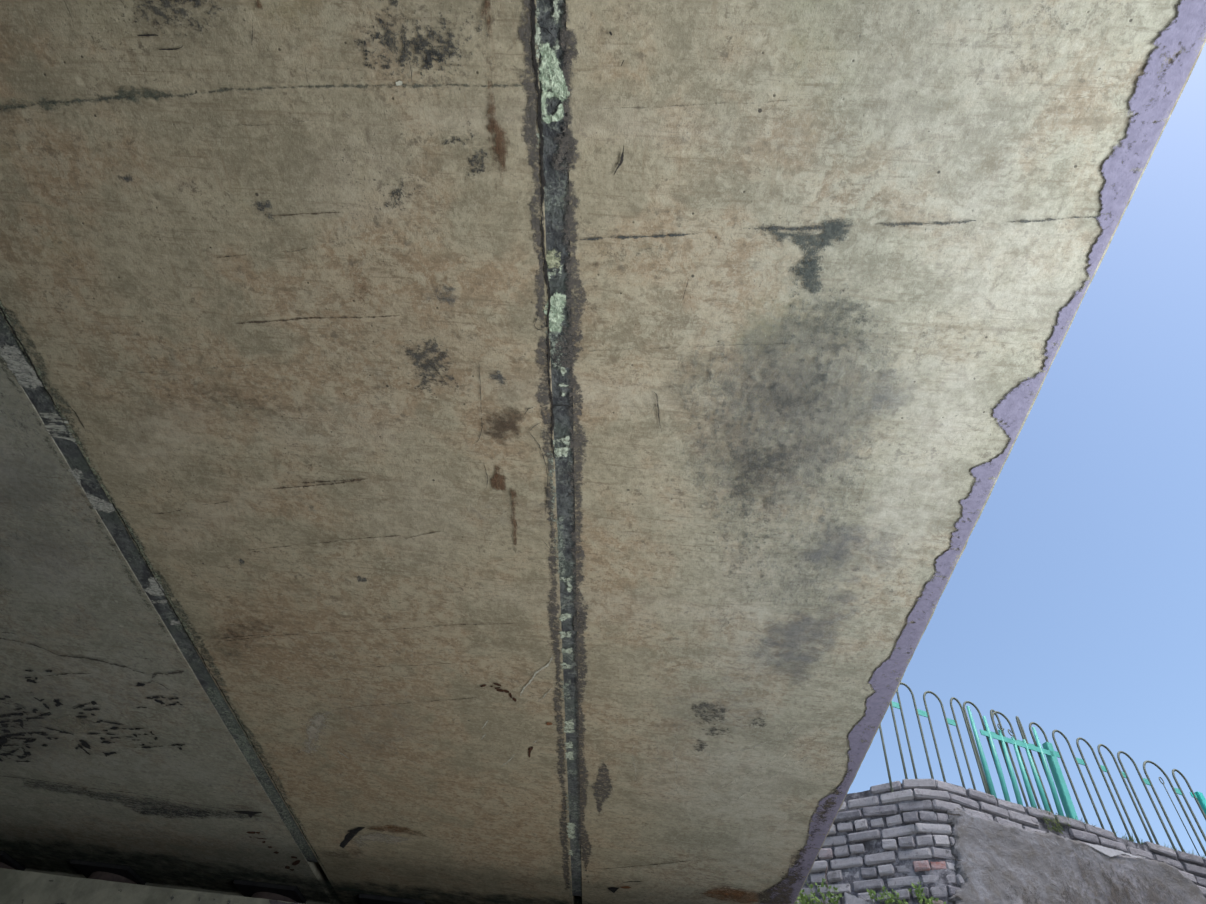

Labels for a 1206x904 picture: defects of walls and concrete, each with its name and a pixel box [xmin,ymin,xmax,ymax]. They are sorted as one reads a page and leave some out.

damp [355,0,488,79]
damp [435,120,489,179]
rust [488,81,510,167]
damp [384,182,420,209]
damp [398,337,458,394]
damp [485,411,523,439]
damp [518,0,612,895]
damp [755,0,1206,904]
rust [491,467,517,545]
peeling [0,670,185,762]
damp [689,702,730,756]